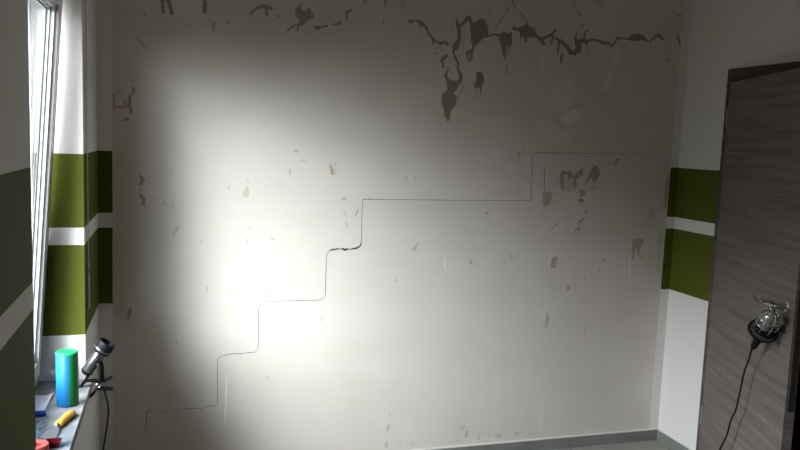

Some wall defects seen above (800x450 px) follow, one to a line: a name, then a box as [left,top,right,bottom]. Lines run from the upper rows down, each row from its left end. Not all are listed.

flaking render [287,3,352,32]
flaking render [408,15,664,121]
crack [177,199,410,411]